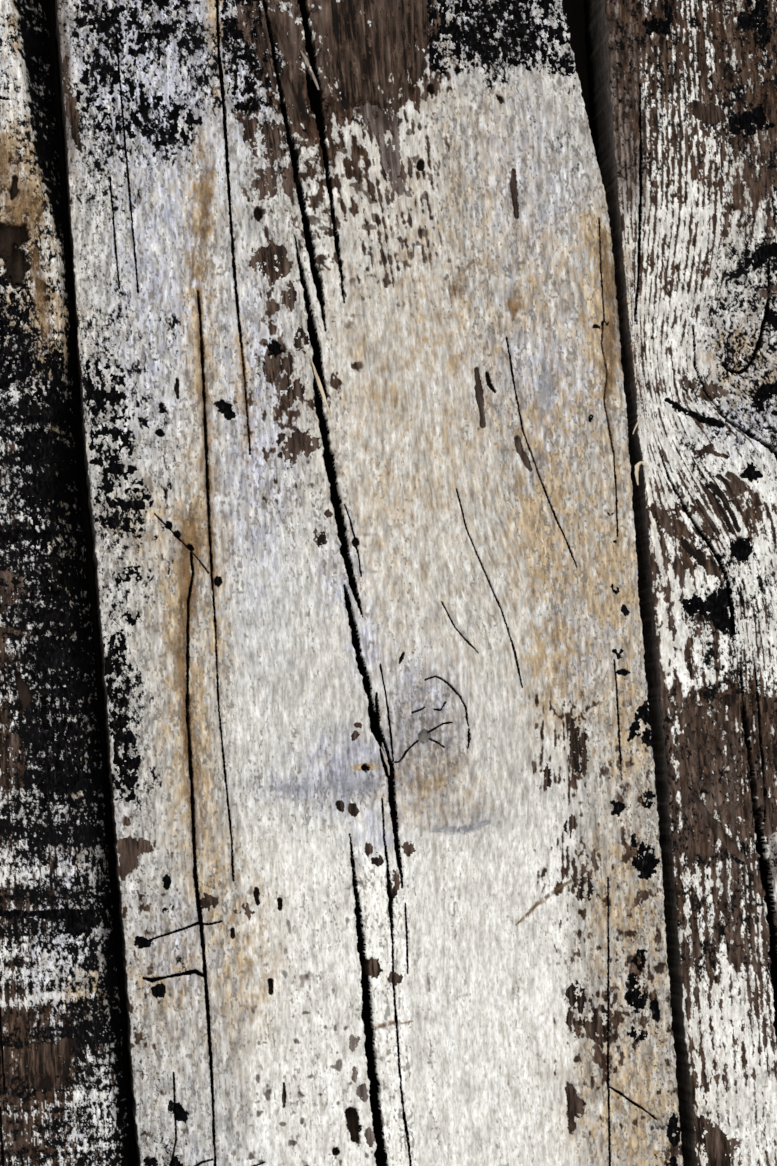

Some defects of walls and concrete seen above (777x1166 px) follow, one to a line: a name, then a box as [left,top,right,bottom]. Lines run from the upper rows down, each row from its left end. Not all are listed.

peeling [62,0,203,159]
peeling [220,0,311,203]
peeling [315,0,576,191]
peeling [688,99,776,138]
crack [216,0,252,455]
crack [692,262,777,461]
peeling [0,247,85,813]
crack [262,0,471,1166]
peeling [103,611,141,802]
crack [143,292,235,1166]
peeling [0,905,95,939]
crack [739,671,777,1048]